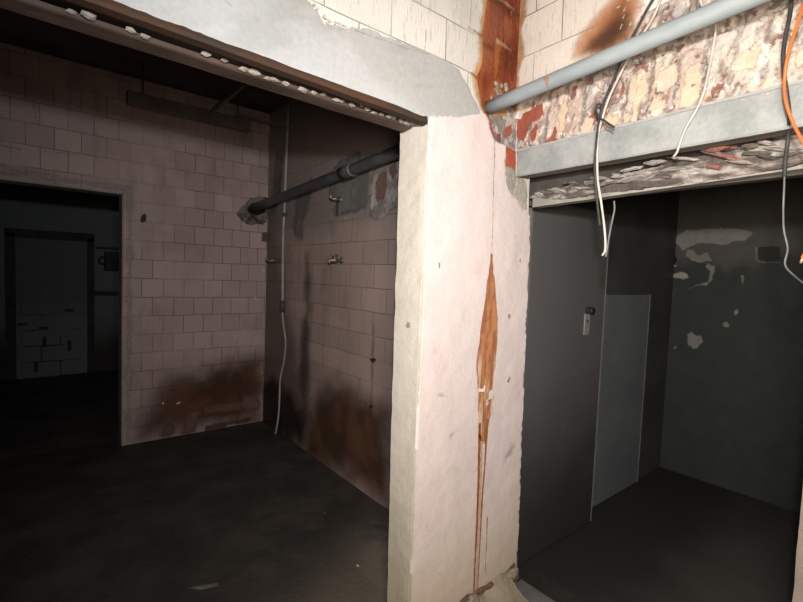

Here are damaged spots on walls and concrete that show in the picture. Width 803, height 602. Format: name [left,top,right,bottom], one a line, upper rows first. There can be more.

corrosion [474,0,526,118]
corrosion [577,0,638,54]
flaking render [488,0,803,210]
peeling [368,158,400,225]
water stain [300,321,308,399]
water stain [146,360,385,490]
corrosion [473,253,498,593]